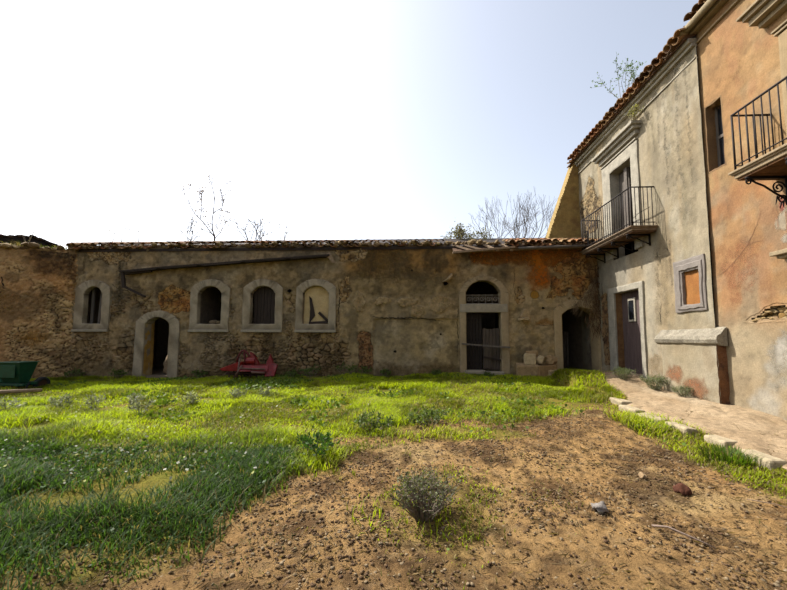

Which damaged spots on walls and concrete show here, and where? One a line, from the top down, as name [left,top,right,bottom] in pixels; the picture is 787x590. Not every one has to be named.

flaking render [547,252,595,300]
peeling [158,285,191,314]
flaking render [743,301,787,324]